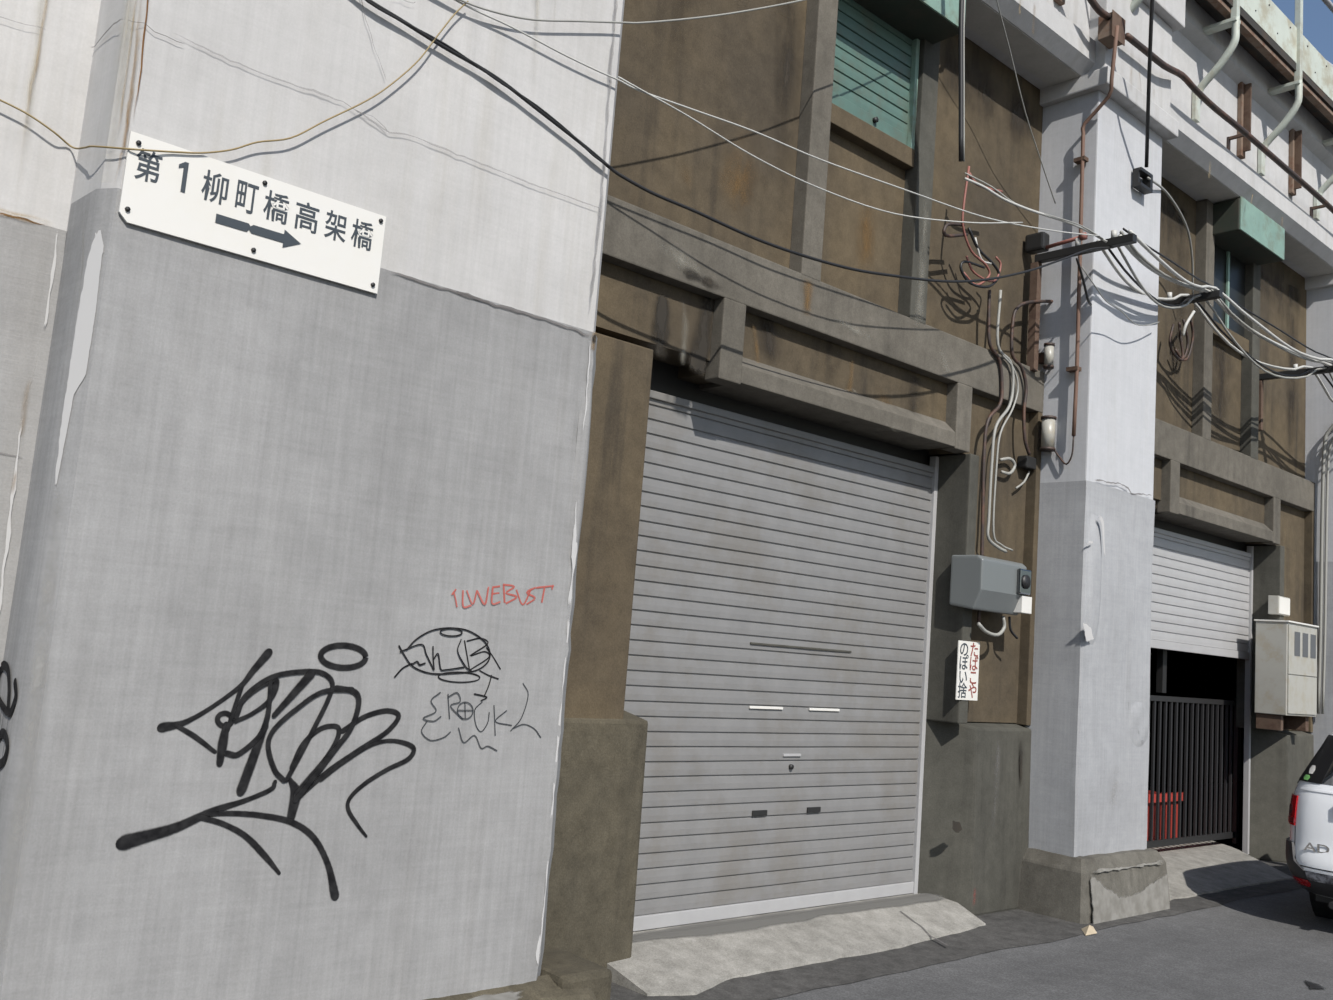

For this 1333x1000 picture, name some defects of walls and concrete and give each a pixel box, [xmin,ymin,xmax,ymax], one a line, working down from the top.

corrosion [121,0,149,154]
crack [92,19,182,48]
peeling [55,230,104,485]